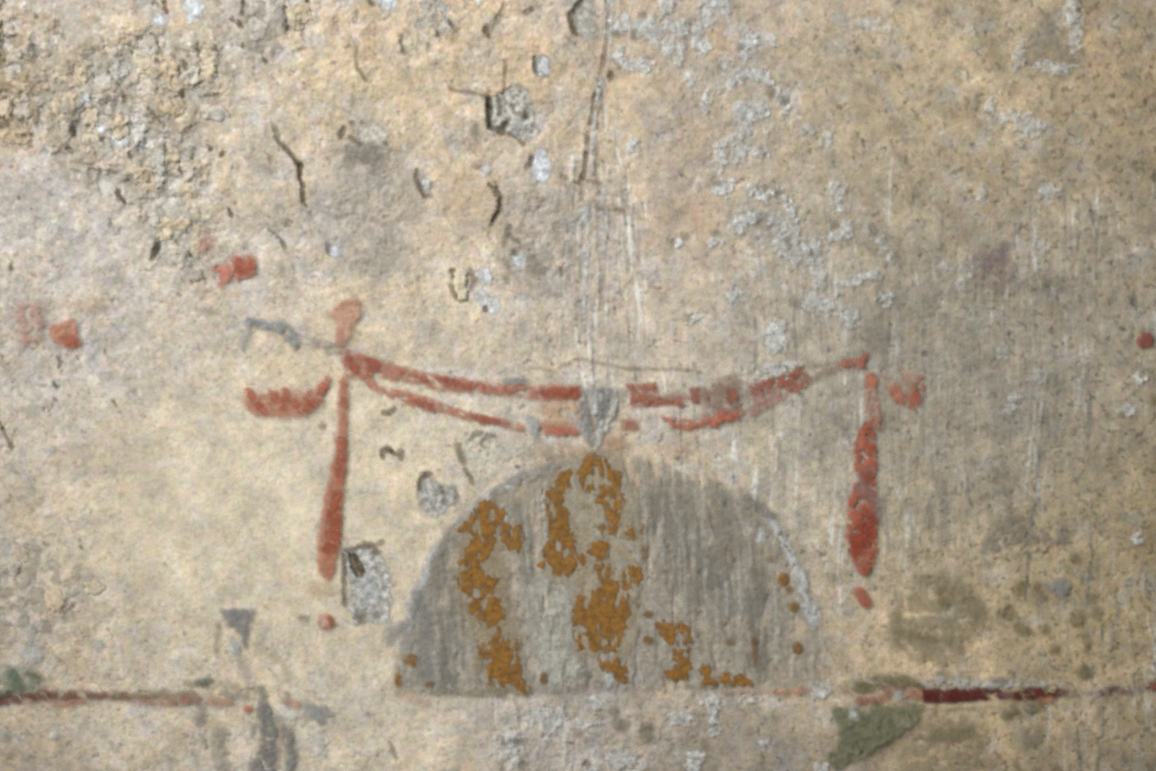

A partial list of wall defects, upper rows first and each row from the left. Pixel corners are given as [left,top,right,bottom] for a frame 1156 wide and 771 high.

flaking render [0,23,24,78]
flaking render [0,92,32,145]
flaking render [60,0,230,193]
crack [274,130,307,207]
spalling [486,85,551,182]
spalling [533,55,551,76]
spalling [569,0,596,40]
flaking render [145,207,205,283]
spalling [343,541,391,626]